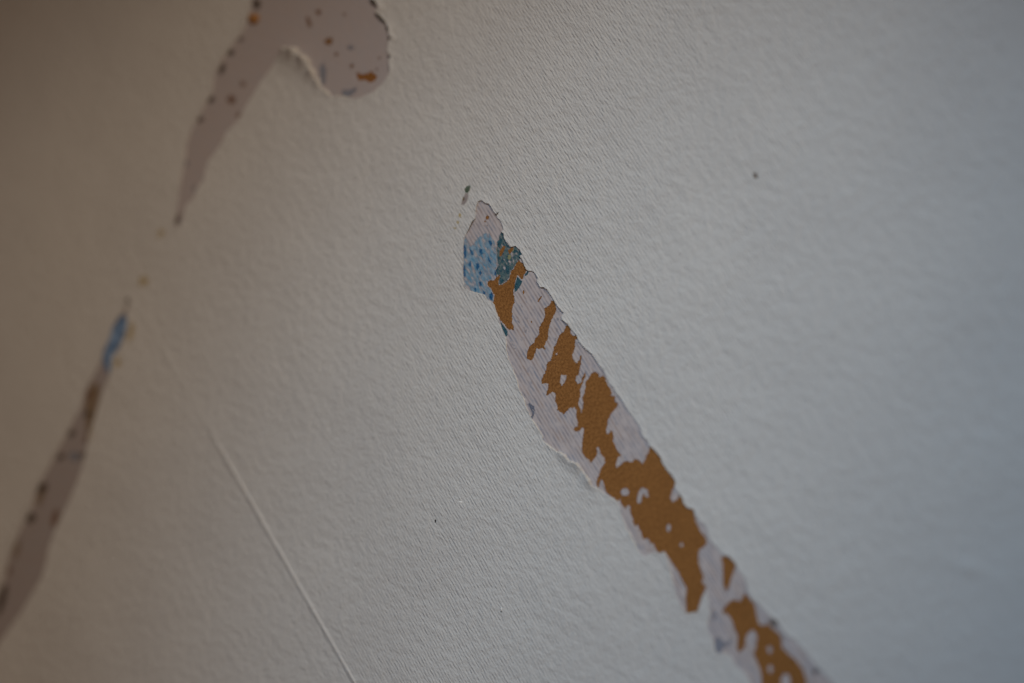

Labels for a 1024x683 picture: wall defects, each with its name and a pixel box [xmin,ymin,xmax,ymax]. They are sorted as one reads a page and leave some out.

peeling [620,487,649,503]
peeling [767,646,791,683]